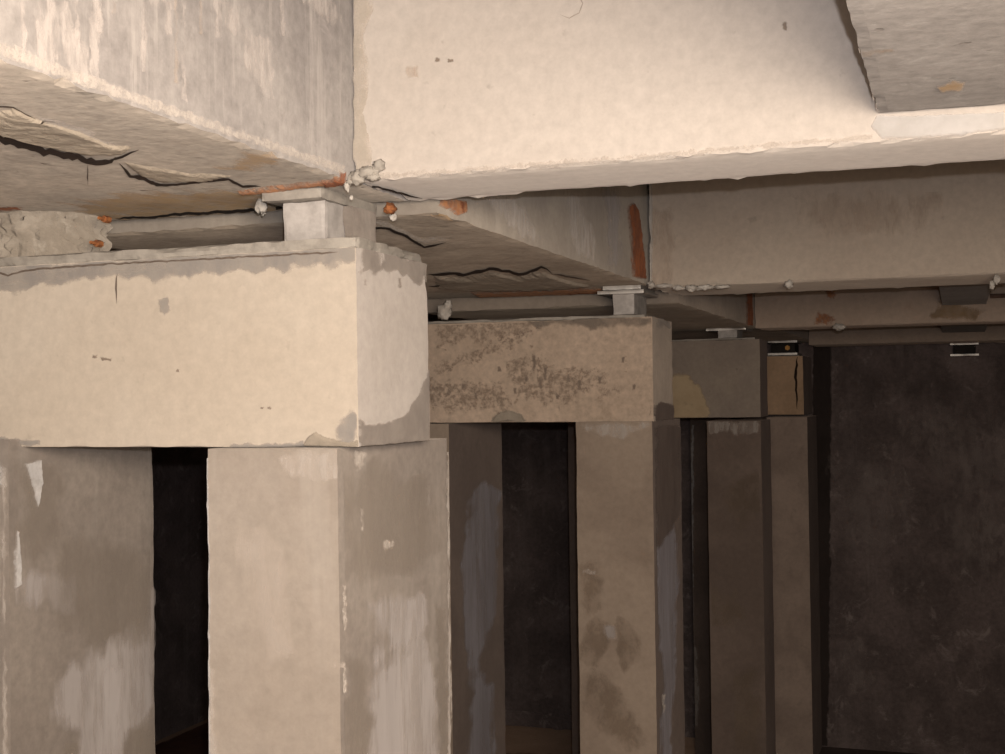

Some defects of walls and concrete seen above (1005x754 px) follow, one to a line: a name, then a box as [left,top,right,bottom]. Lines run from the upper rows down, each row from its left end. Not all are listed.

crack [0,136,283,219]
rust [238,172,346,196]
crack [376,227,446,248]
crack [429,266,590,287]
rust [629,203,647,279]
water stain [347,371,430,571]
water stain [15,460,62,604]
water stain [57,458,214,754]
water stain [340,588,452,754]